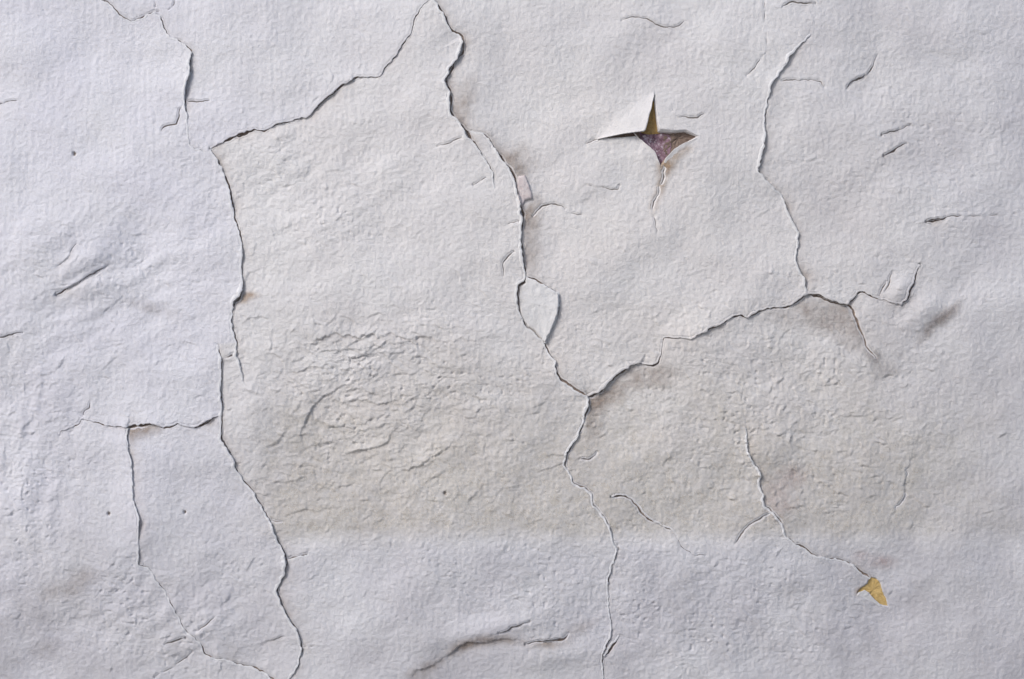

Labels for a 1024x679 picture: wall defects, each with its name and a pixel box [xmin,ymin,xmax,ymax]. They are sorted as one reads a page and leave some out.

crack [100,0,210,152]
crack [0,98,17,106]
flaking render [639,132,671,164]
crack [927,213,1015,224]
crack [56,243,108,296]
crack [0,331,23,339]
crack [209,0,921,679]
crack [58,345,312,679]
peeling [857,577,888,607]